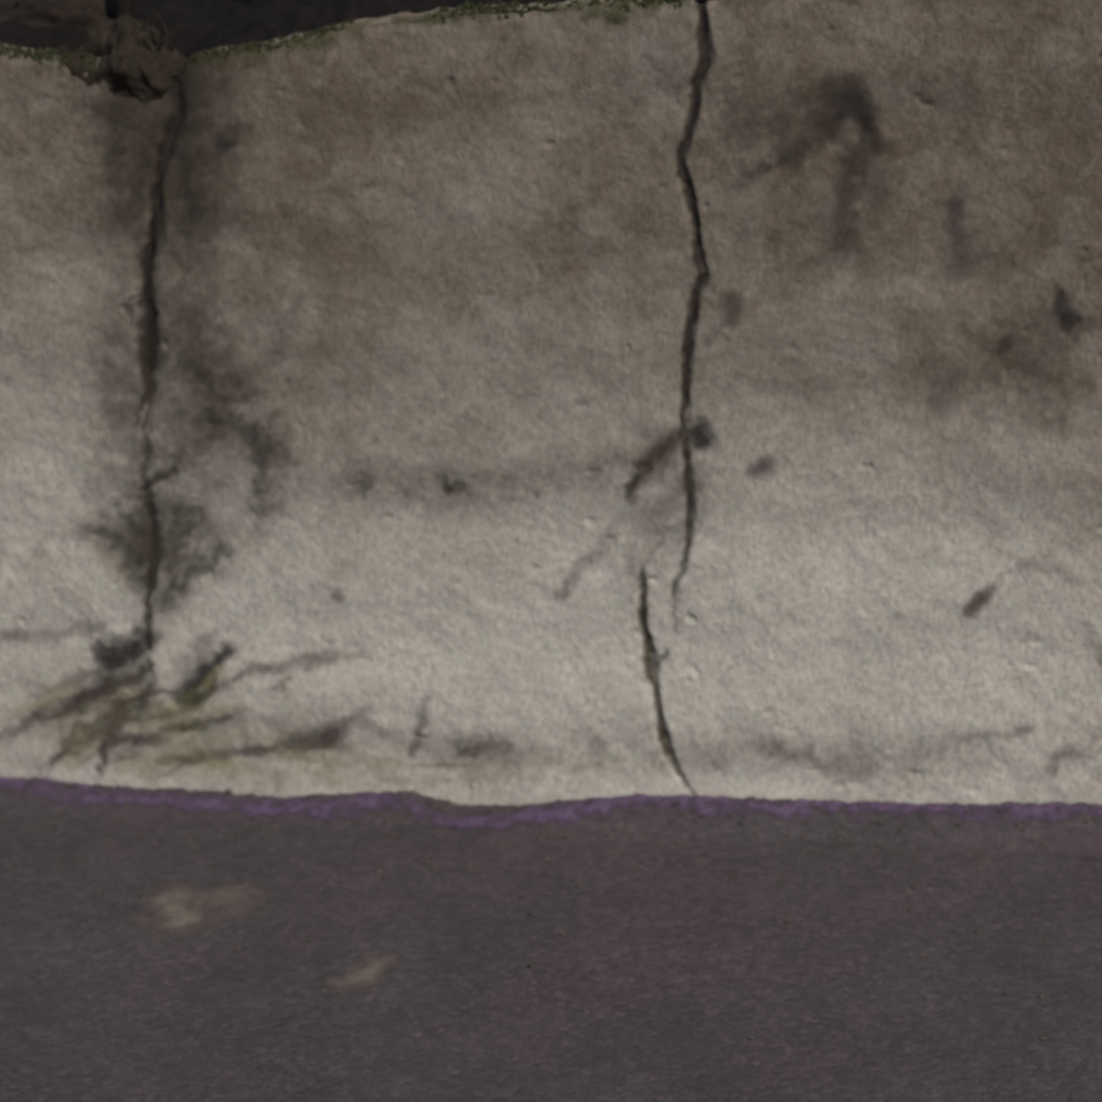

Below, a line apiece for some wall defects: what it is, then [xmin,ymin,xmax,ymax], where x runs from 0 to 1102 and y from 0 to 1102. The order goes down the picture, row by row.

crack [138,83,186,408]
crack [677,0,711,569]
crack [140,445,168,634]
crack [639,572,685,781]